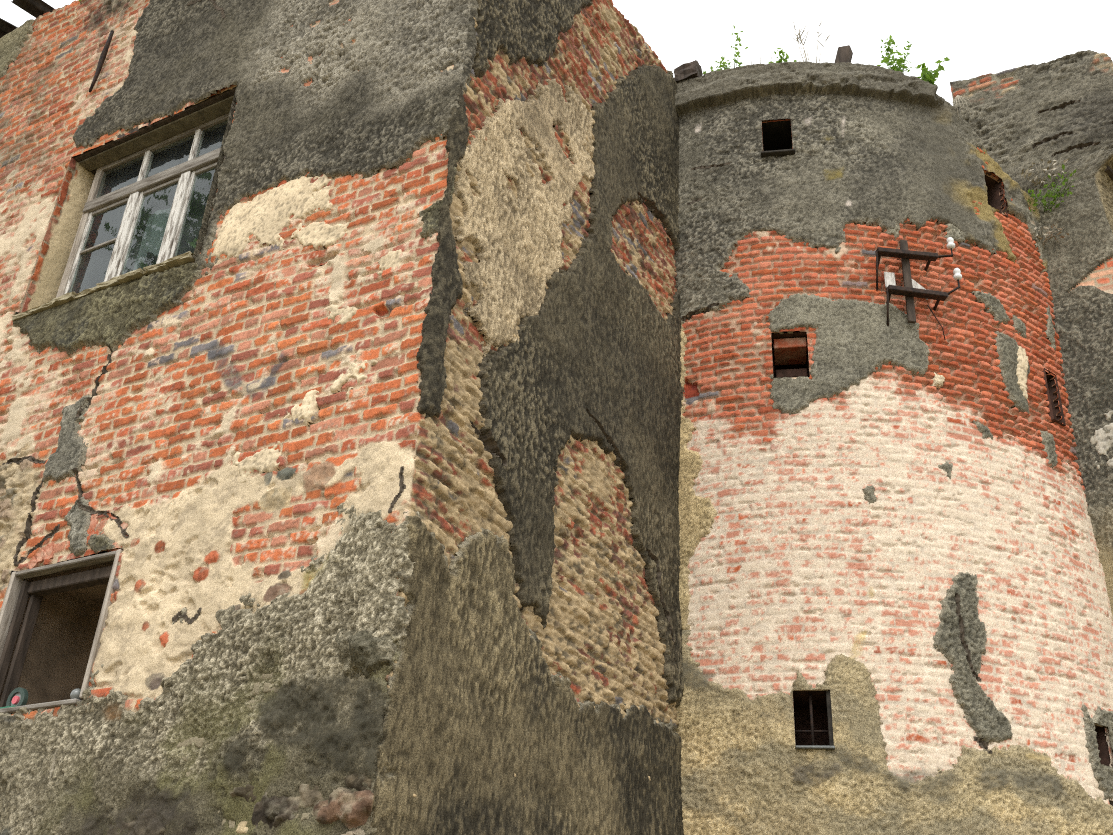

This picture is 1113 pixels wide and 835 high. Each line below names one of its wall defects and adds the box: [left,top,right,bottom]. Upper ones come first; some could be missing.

peeling [0,19,35,78]
peeling [13,0,593,356]
crack [76,345,112,417]
peeling [278,358,378,427]
crack [2,456,129,566]
peeling [232,441,282,483]
peeling [416,61,1113,835]
peeling [0,503,684,835]